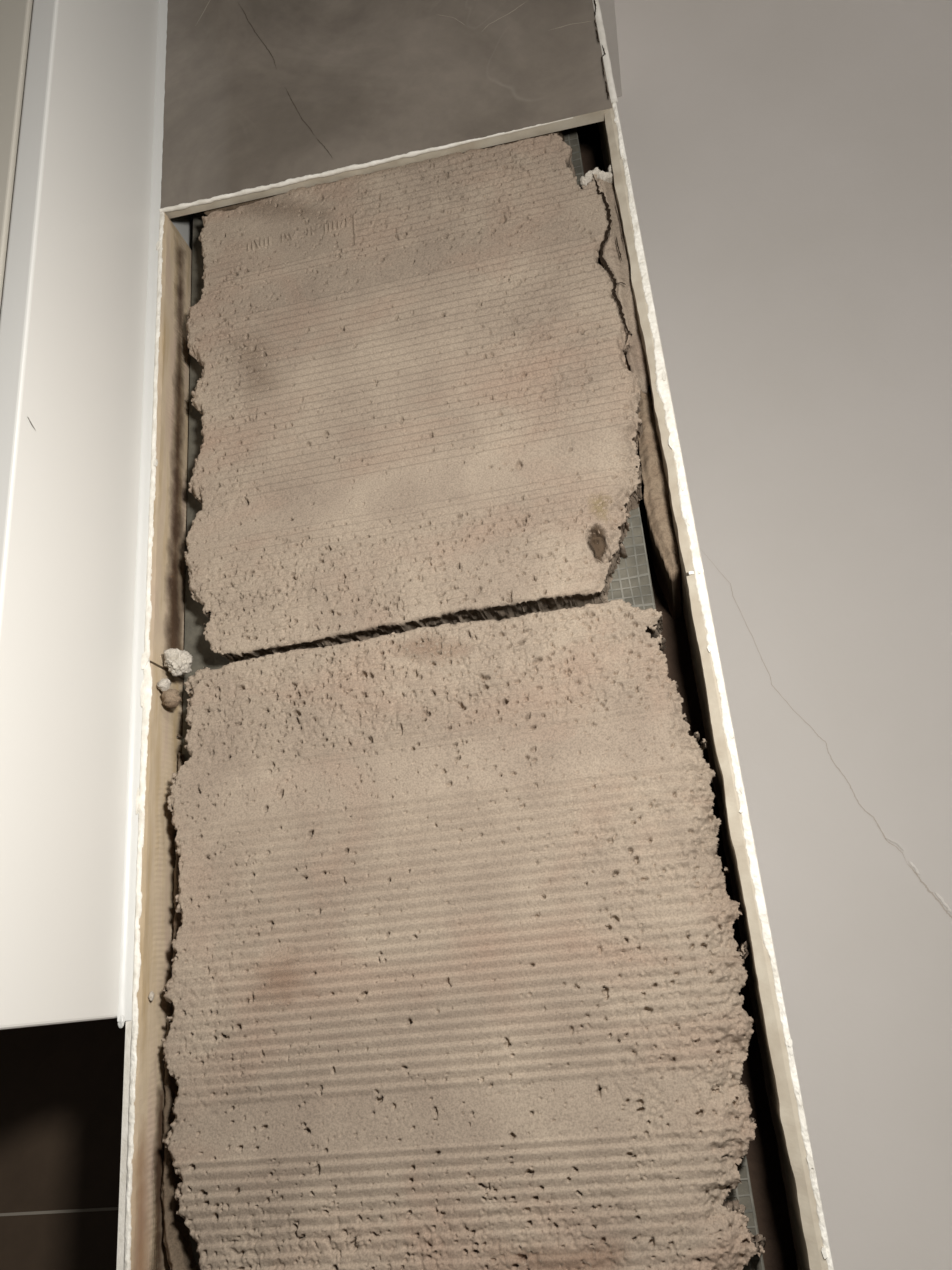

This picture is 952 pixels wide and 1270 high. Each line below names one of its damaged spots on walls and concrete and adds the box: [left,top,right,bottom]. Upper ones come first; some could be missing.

spalling [589,524,606,562]
spalling [612,101,834,1270]
crack [704,553,952,918]